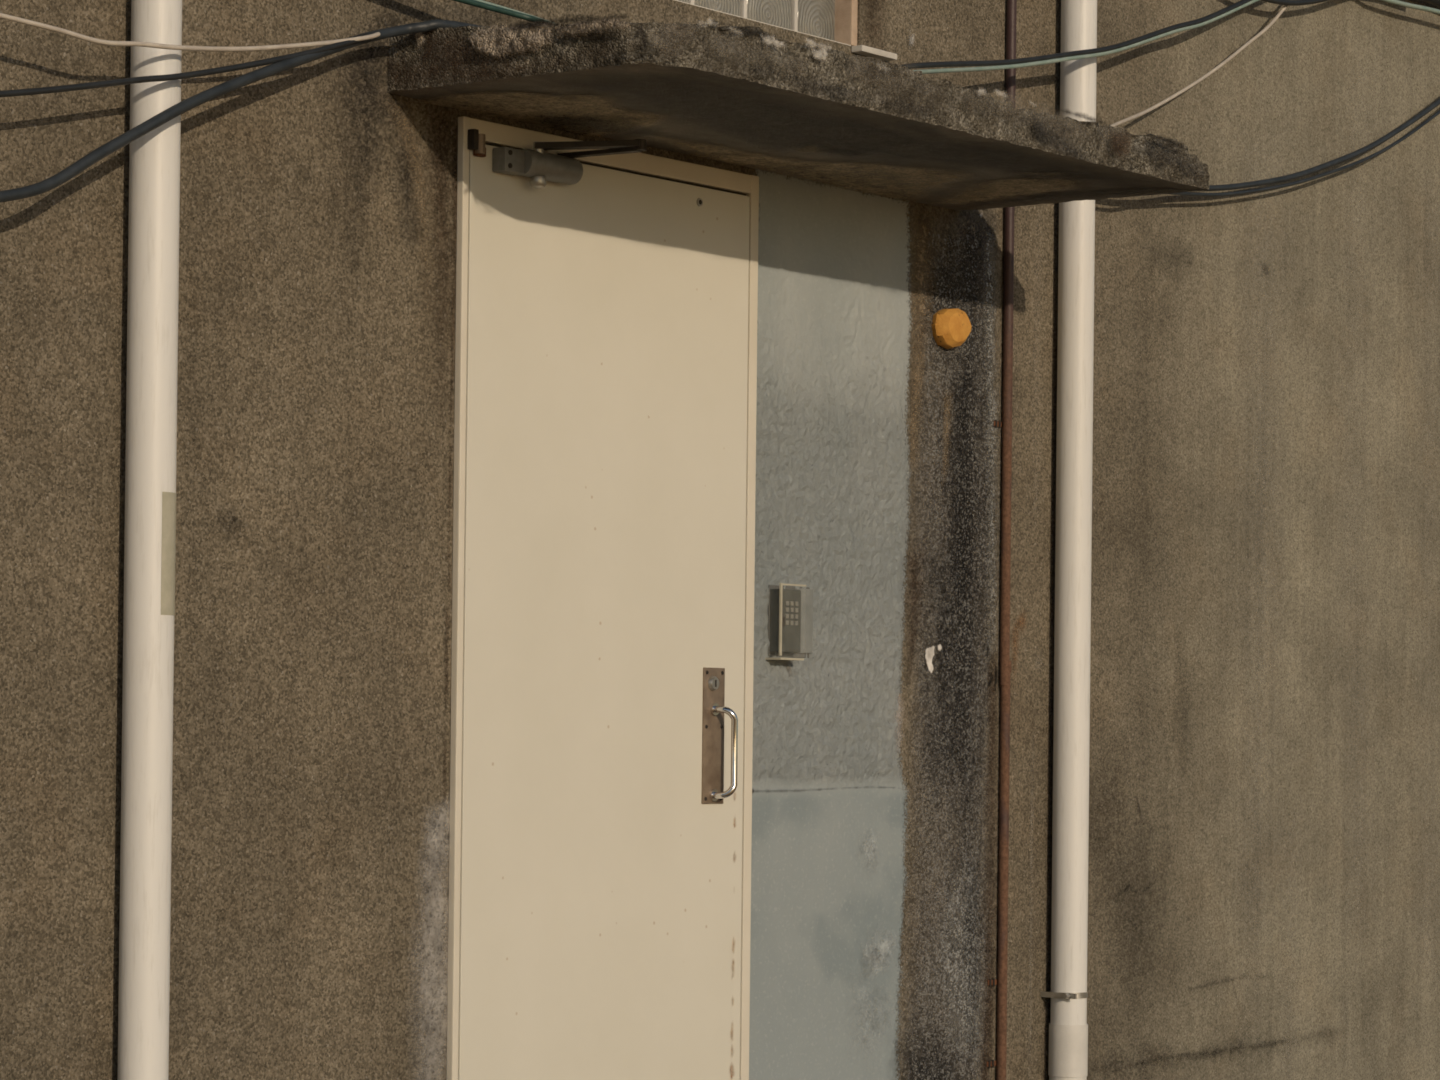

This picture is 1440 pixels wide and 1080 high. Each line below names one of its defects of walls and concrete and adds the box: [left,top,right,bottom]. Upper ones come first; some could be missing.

damp [400,93,661,234]
damp [678,143,1080,1080]
damp [420,805,449,1080]